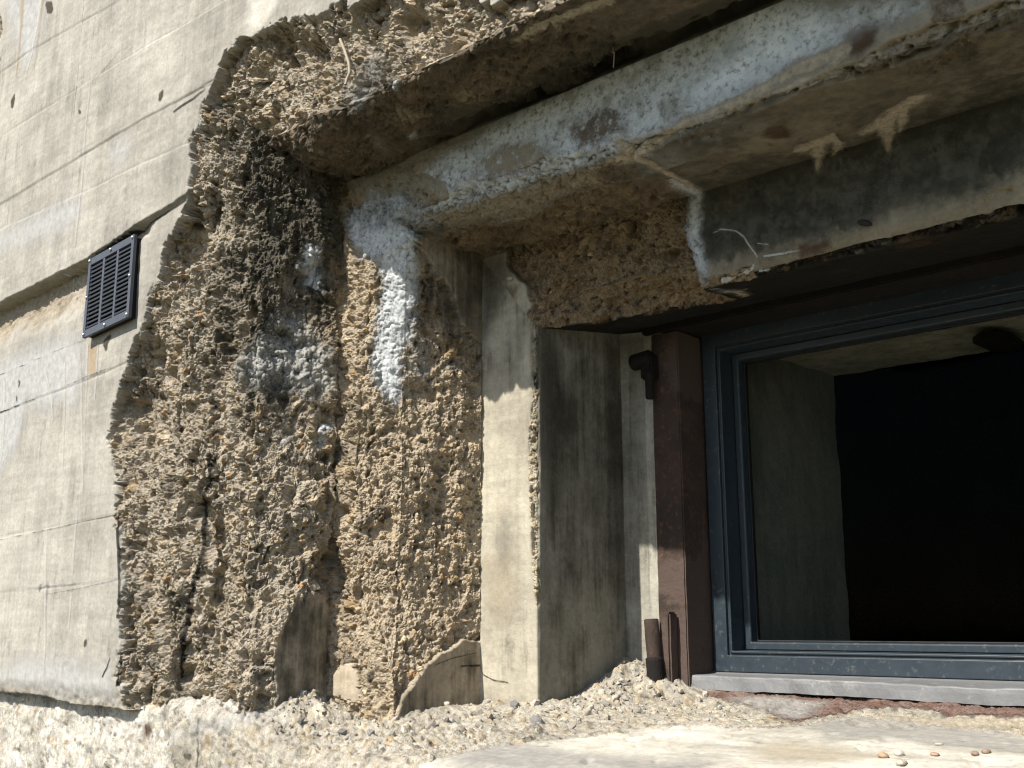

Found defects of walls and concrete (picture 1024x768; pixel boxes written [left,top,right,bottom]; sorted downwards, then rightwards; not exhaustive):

spalling [108,0,757,722]
water stain [346,0,1024,405]
crack [18,515,121,618]
crack [179,452,214,678]